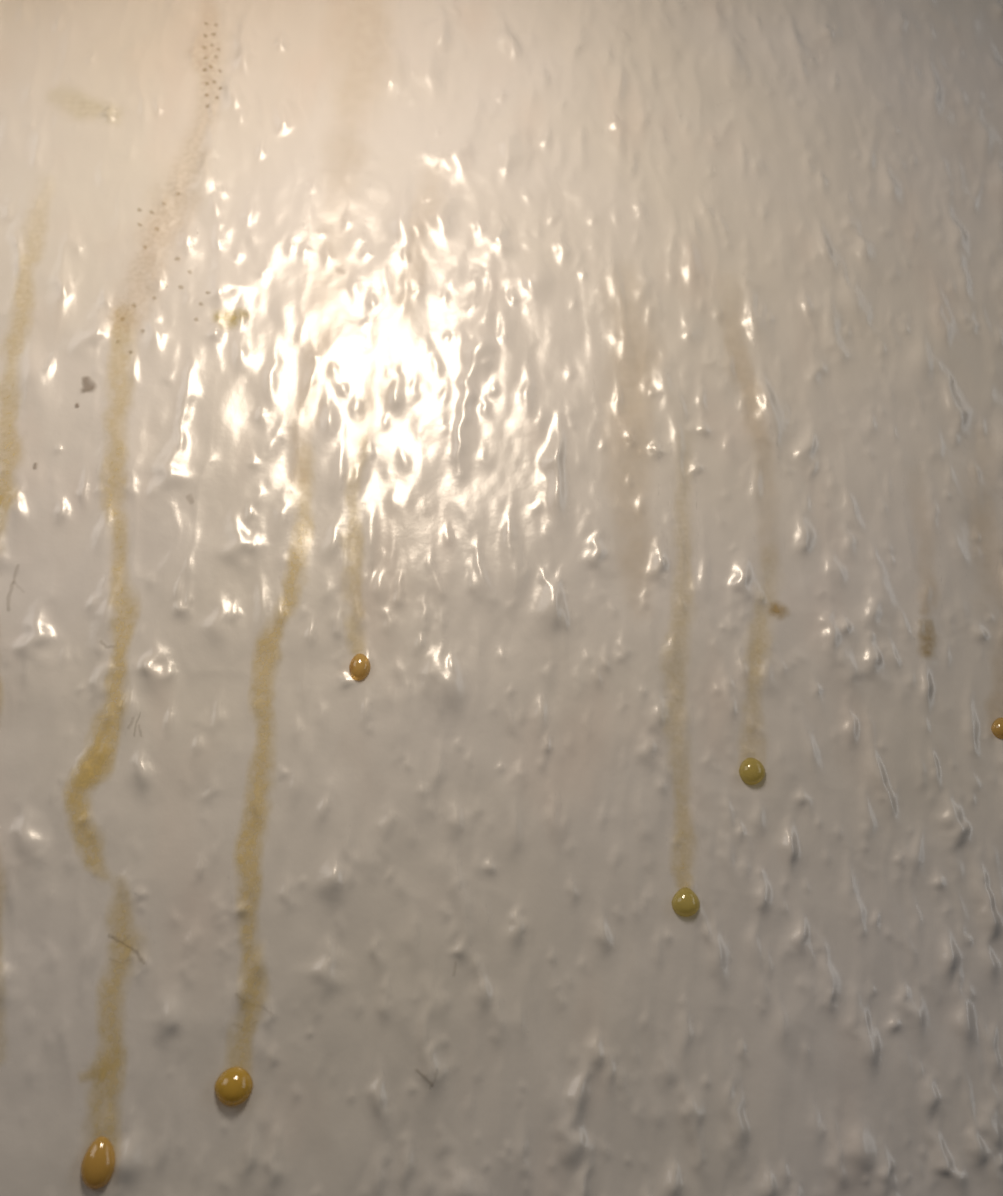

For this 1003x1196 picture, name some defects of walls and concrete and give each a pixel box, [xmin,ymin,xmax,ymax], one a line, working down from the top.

water stain [81,1128,115,1189]